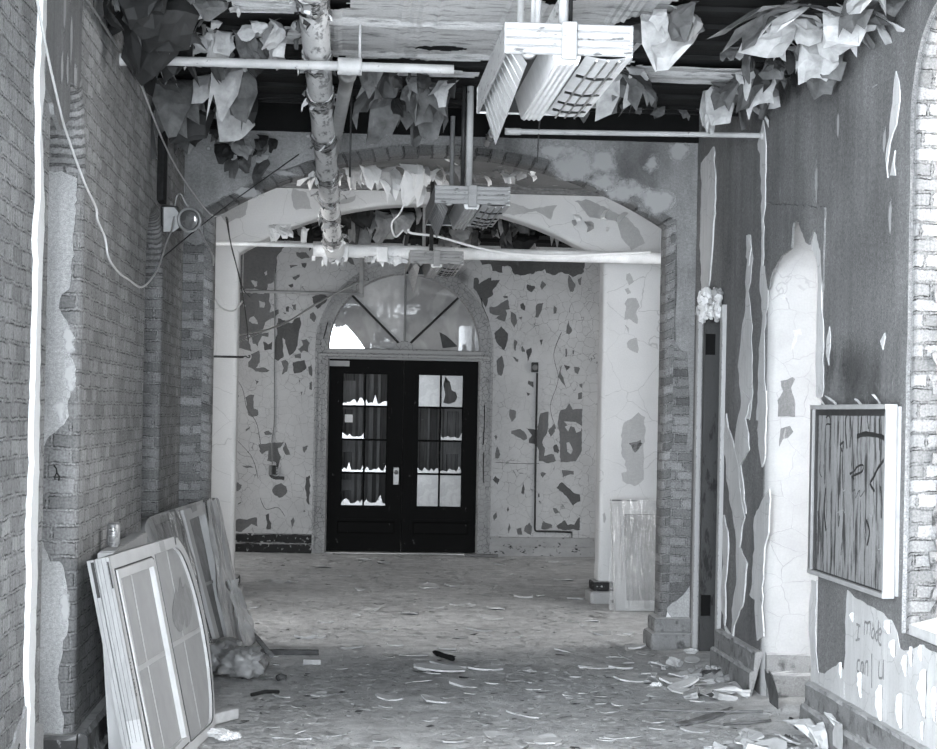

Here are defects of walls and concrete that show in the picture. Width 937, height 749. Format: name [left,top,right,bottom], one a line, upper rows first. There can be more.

flaking render [44,171,78,446]
peeling [239,164,559,395]
peeling [473,260,585,376]
flaking render [572,0,909,641]
flaking render [39,541,69,734]
peeling [238,395,258,431]
peeling [236,514,272,532]
peeling [259,431,290,498]
peeling [508,508,580,535]
peeling [509,349,583,505]
peeling [809,580,937,749]
spalling [928,504,937,620]